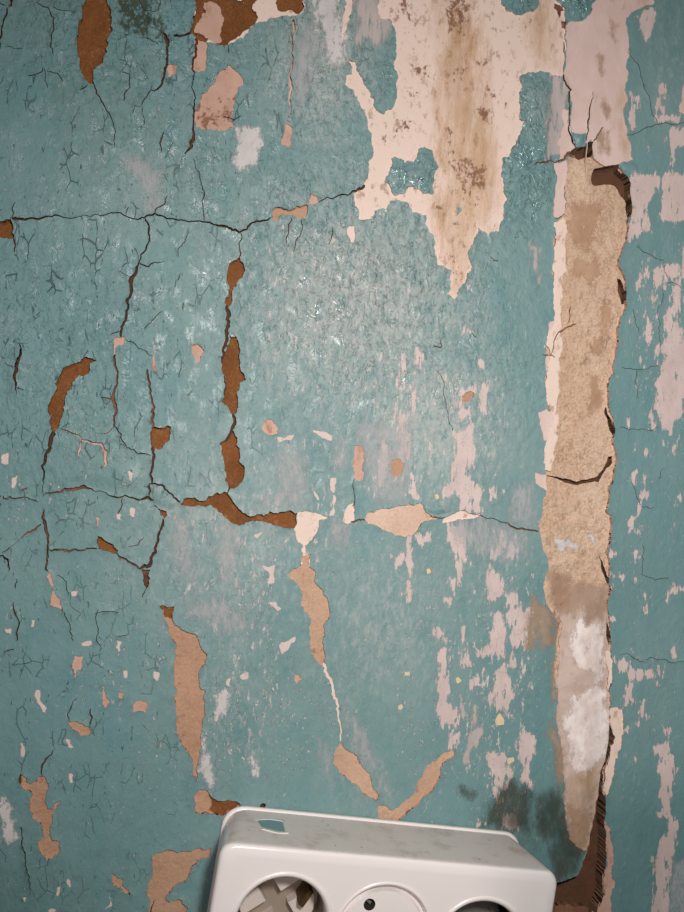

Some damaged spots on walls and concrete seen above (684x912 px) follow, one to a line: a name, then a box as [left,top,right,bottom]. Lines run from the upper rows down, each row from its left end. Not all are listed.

crack [342,0,353,42]
crack [627,52,684,136]
crack [319,185,365,202]
crack [0,0,303,665]
peeling [155,0,684,828]
crack [351,480,365,523]
crack [470,513,538,532]
spalling [553,646,679,912]
spalling [147,848,211,912]